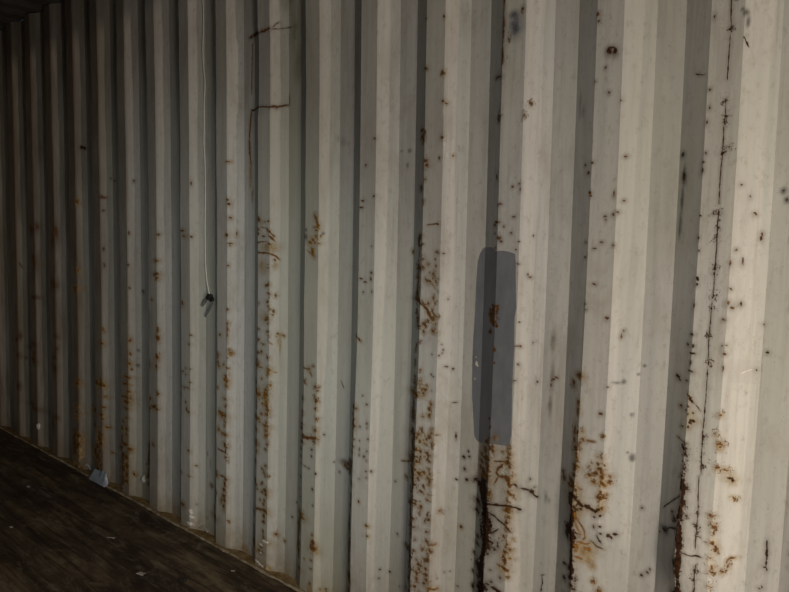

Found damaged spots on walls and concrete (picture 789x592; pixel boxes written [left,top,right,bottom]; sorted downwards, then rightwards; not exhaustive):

rust [257,216,280,269]
rust [92,327,160,489]
rust [217,348,235,464]
rust [242,283,285,553]
rust [292,488,318,572]
rust [300,365,325,457]
rust [399,234,445,592]
rust [455,436,525,592]
rust [561,373,618,592]
rust [663,98,736,592]